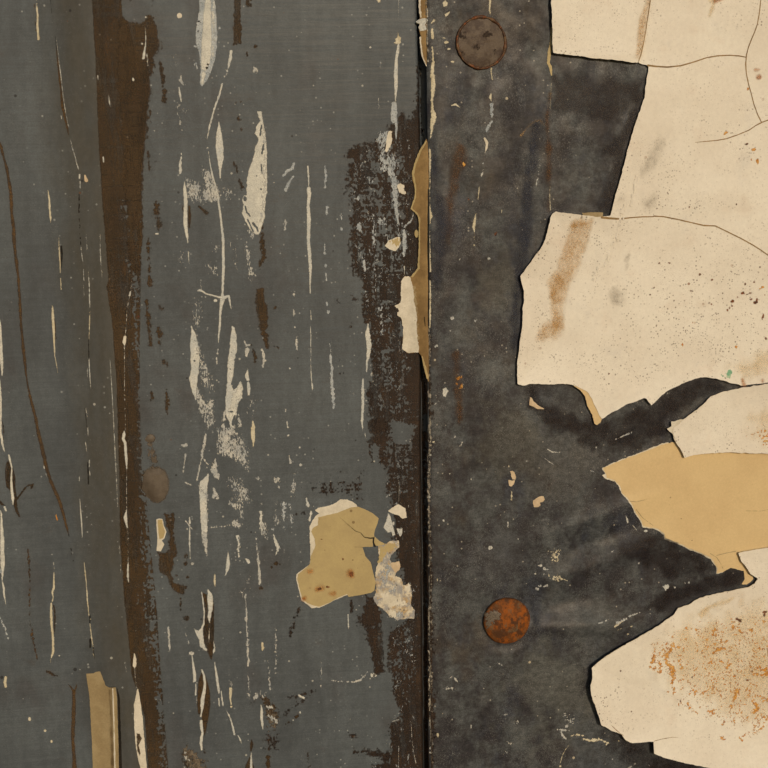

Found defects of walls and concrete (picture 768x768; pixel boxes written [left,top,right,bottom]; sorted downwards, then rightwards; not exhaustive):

peeling [233,0,252,46]
crack [638,0,768,143]
spalling [233,125,267,232]
peeling [517,0,768,458]
crack [601,215,768,255]
peeling [289,59,438,768]
peeling [86,671,122,768]
peeling [590,548,768,768]
corrosion [649,611,768,742]